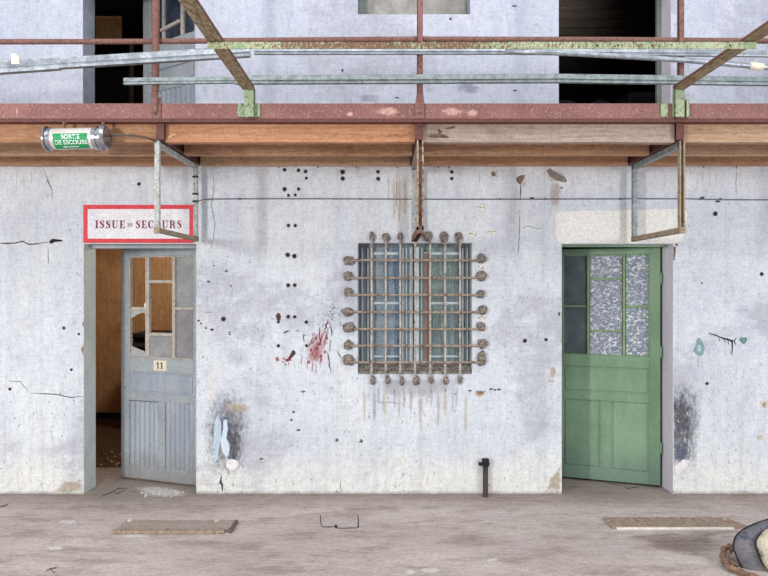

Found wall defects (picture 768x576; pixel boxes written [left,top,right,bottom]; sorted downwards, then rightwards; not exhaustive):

crack [0,239,62,264]
crack [709,333,737,354]
crack [12,381,83,398]